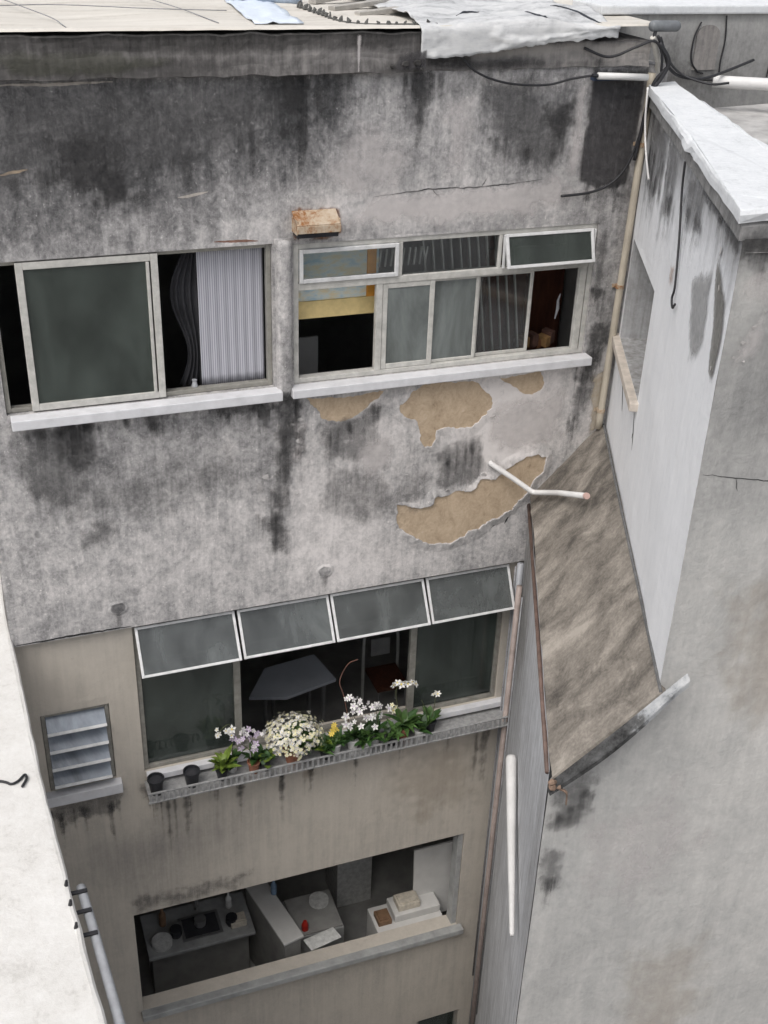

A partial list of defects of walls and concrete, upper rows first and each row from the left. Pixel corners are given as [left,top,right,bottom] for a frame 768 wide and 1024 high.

water stain [287,76,319,153]
water stain [547,60,646,188]
crack [375,180,536,197]
water stain [35,424,92,465]
water stain [218,397,301,549]
peeling [291,370,554,462]
peeling [384,443,552,552]